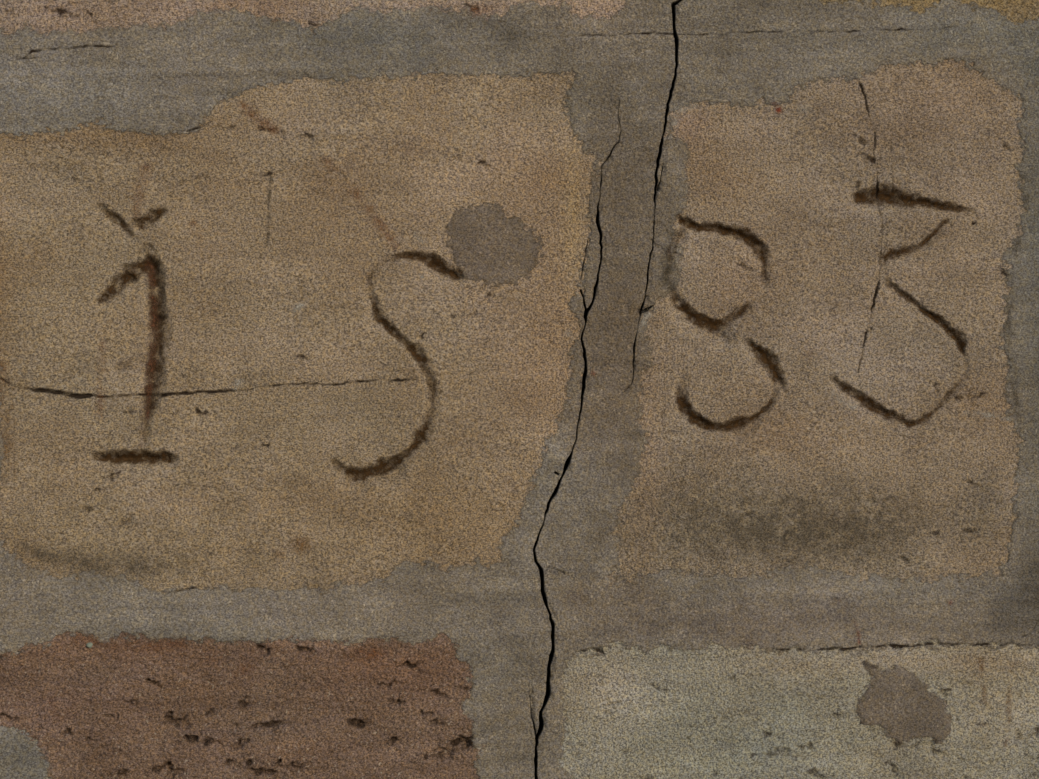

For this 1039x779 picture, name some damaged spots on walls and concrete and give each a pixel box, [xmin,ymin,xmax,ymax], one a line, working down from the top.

crack [628,0,780,361]
crack [1,378,407,399]
crack [531,136,620,779]